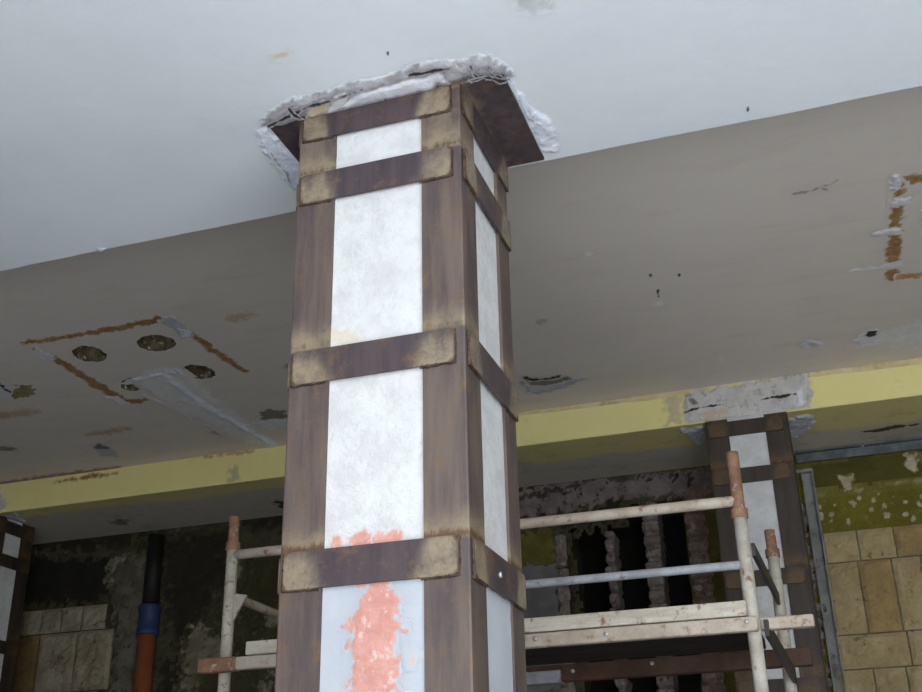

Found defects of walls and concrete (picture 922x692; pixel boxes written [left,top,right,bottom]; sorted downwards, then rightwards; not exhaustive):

spalling [257,52,517,128]
corrosion [879,170,922,283]
corrosion [16,314,162,408]
corrosion [188,331,253,376]
spalling [517,374,591,395]
peeling [791,385,809,408]
leakage [807,449,922,499]
flaking render [327,521,407,548]
leakage [23,515,283,671]
flaking render [335,581,413,692]